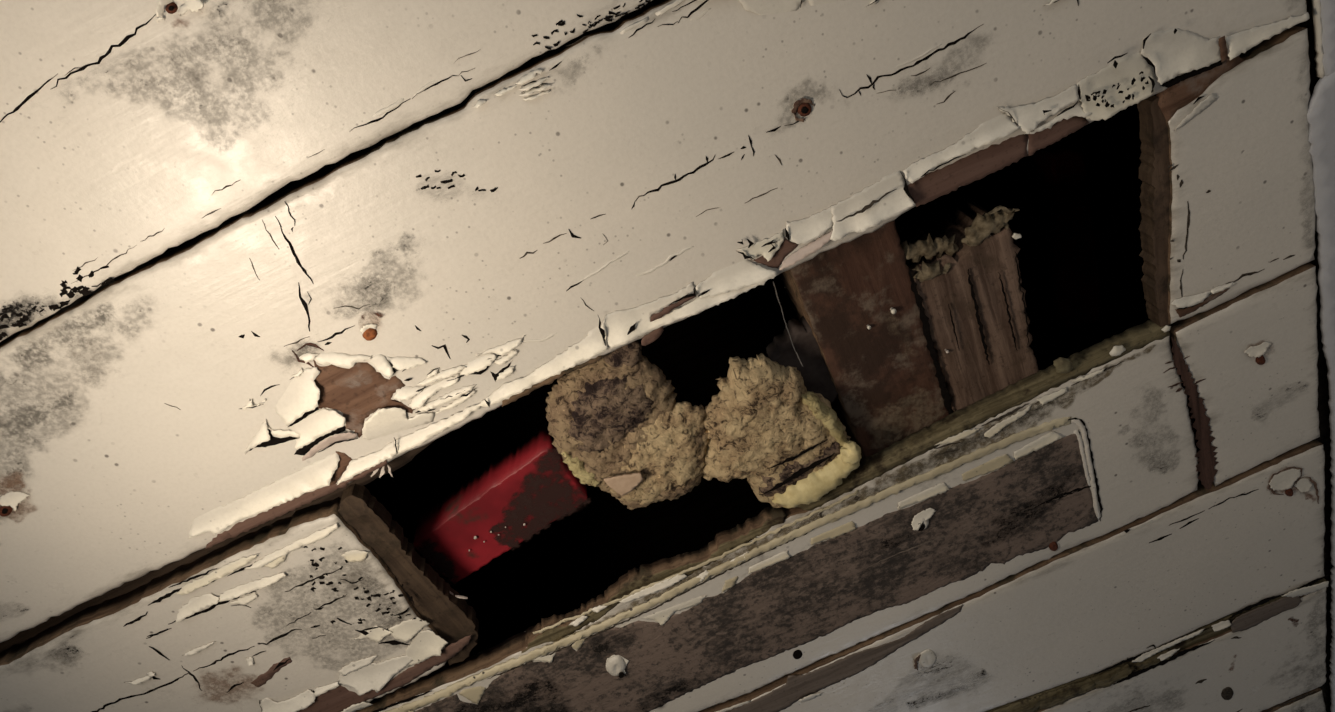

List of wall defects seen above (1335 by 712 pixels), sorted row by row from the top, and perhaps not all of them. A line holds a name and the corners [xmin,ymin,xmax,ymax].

crack [0,14,156,122]
crack [839,24,986,104]
damp [0,266,115,340]
crack [71,228,165,284]
crack [203,180,240,218]
crack [519,121,799,311]
peeling [188,12,1310,550]
damp [842,345,1155,507]
crack [92,569,364,712]
peeling [123,523,472,712]
damp [586,514,821,629]
peeling [415,434,1098,712]